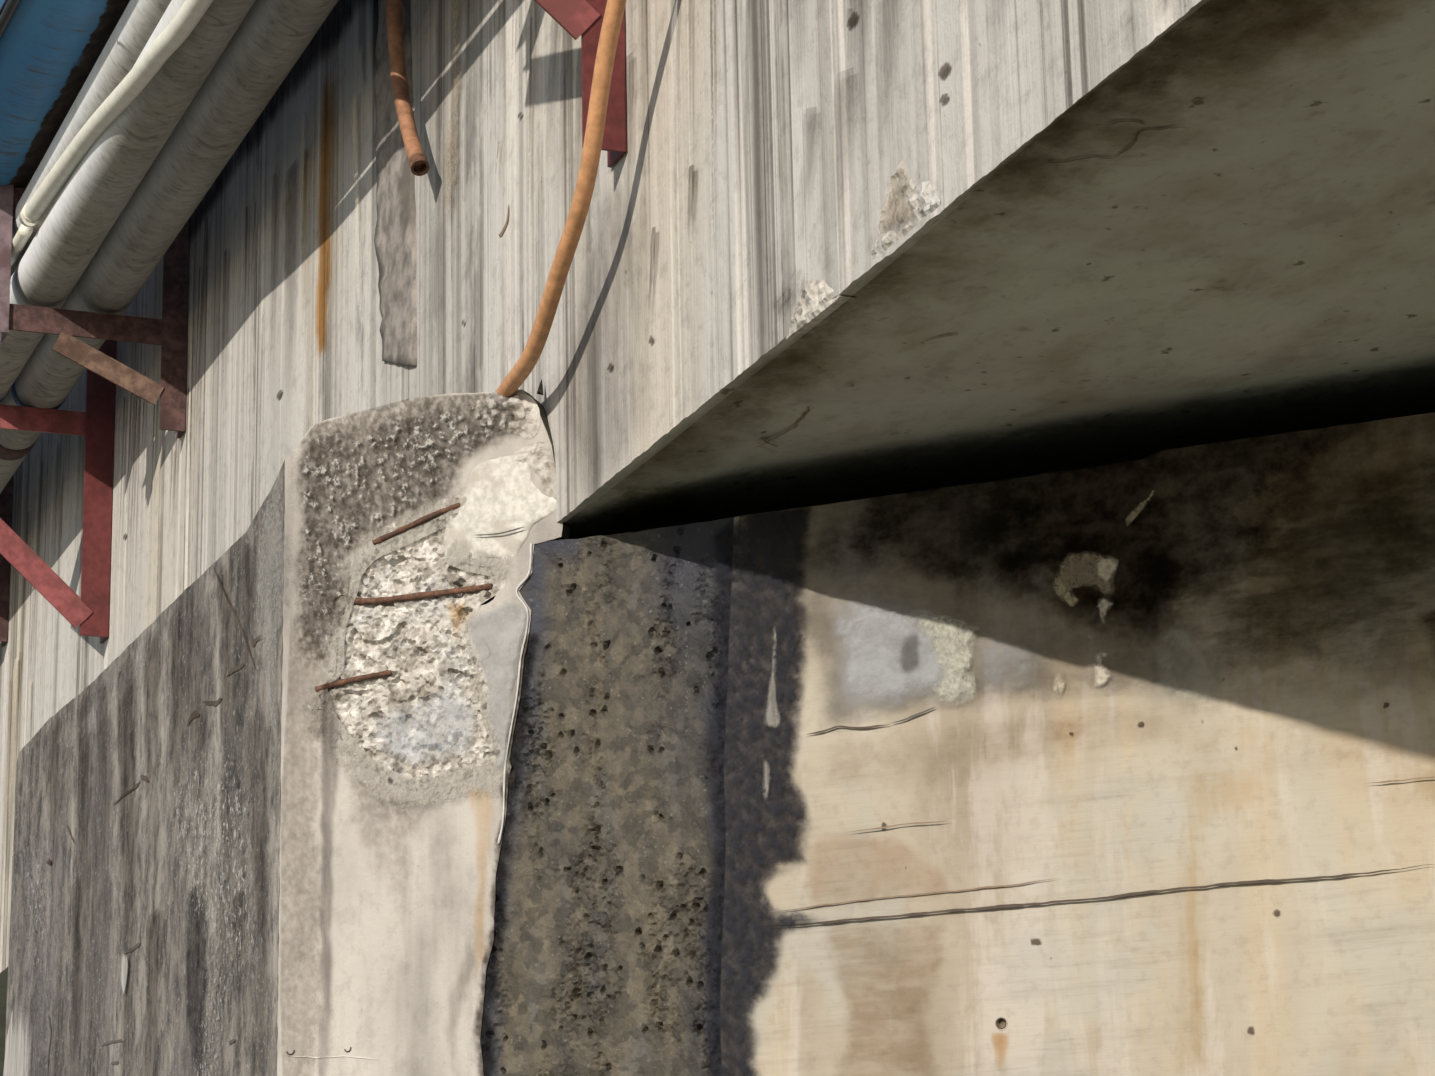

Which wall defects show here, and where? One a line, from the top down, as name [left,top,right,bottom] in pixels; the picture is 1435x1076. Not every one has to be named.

spalling [465,393,557,500]
peeling [1054,552,1118,618]
spalling [307,494,532,844]
peeling [1094,653,1109,685]
damp [564,366,1435,1076]
crack [850,821,944,832]
crack [764,864,1435,927]